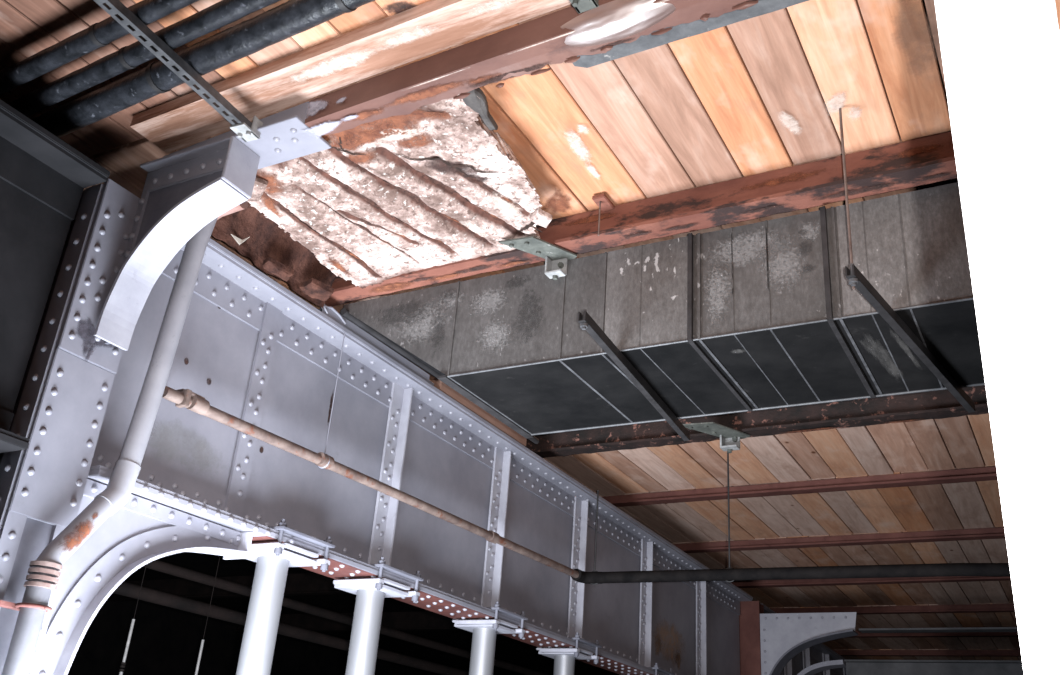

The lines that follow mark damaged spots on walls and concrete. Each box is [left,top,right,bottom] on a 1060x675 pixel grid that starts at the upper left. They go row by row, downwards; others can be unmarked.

peeling [305,97,357,137]
peeling [463,88,498,130]
peeling [529,208,553,228]
corrosion [64,514,98,551]